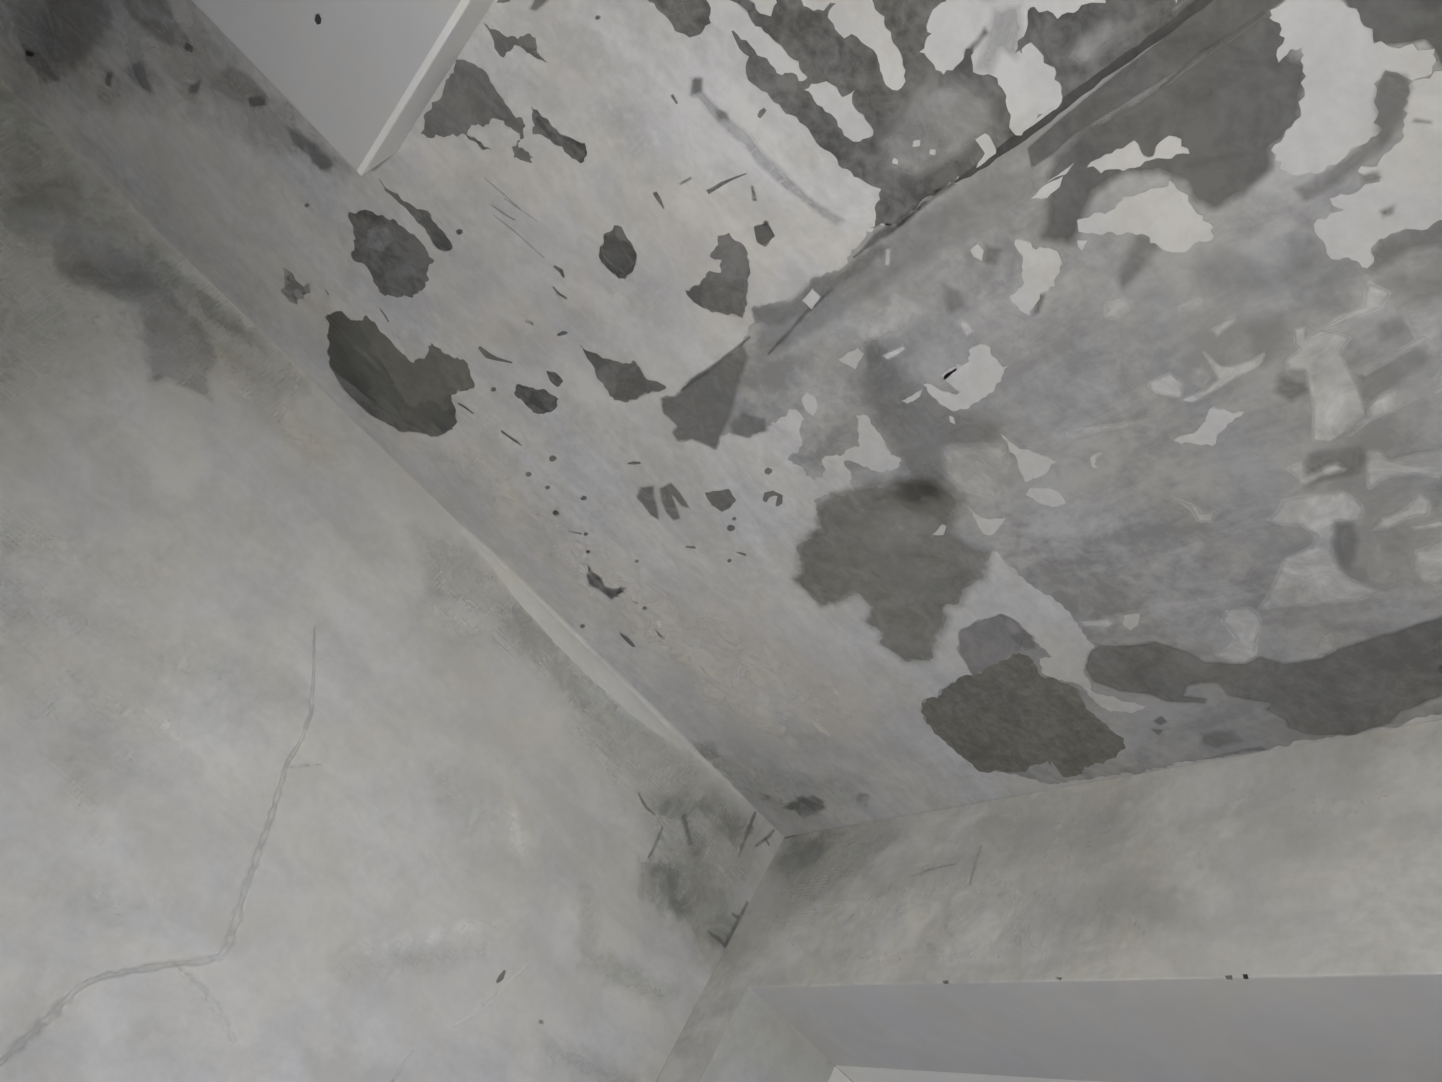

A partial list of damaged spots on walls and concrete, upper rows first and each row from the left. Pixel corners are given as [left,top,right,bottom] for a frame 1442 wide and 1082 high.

peeling [484,23,547,63]
peeling [421,59,587,163]
peeling [281,268,329,304]
peeling [325,179,496,437]
spalling [478,346,513,364]
peeling [514,371,563,414]
peeling [569,0,1442,785]
crack [0,628,315,1065]